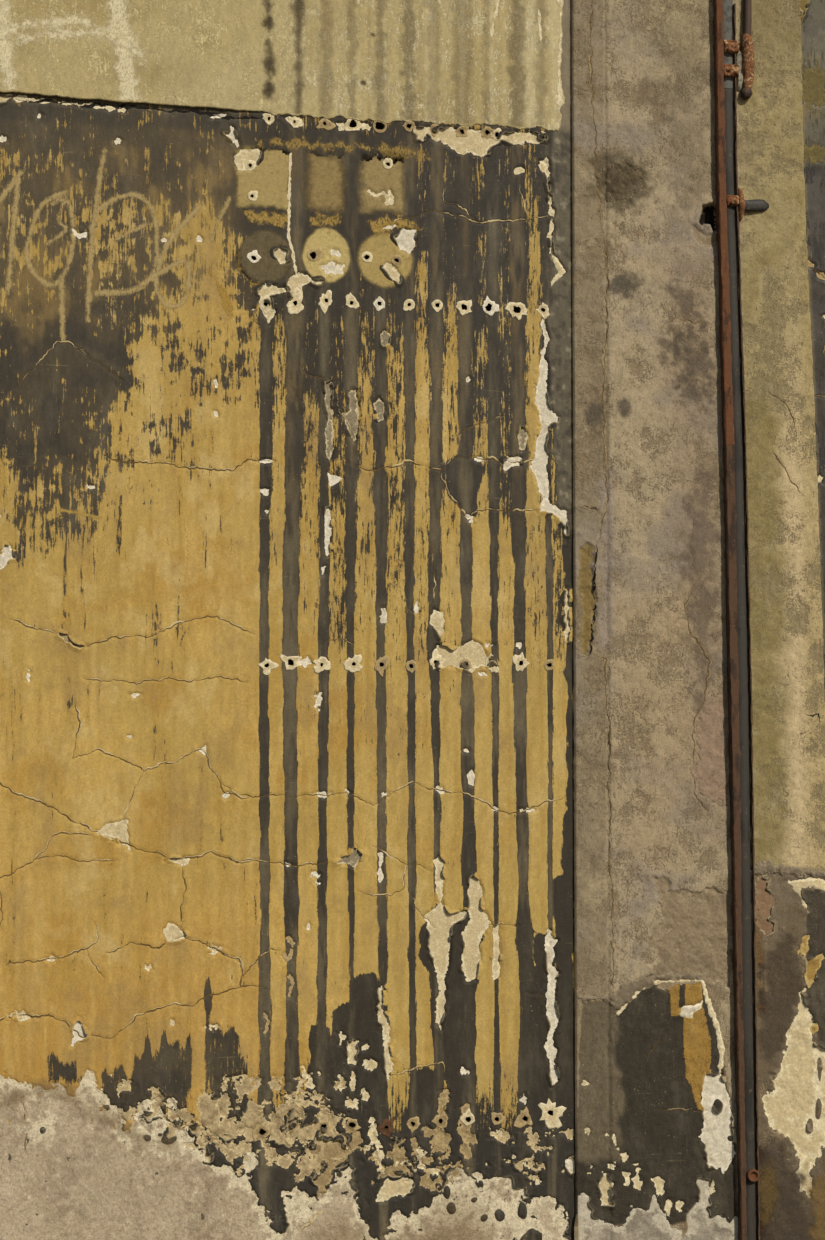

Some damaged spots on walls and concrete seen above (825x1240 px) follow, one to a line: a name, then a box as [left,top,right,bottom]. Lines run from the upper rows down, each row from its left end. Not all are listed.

damp [263,10,273,95]
damp [293,0,303,113]
corrosion [741,34,755,89]
flaking render [406,123,566,286]
crack [12,615,251,647]
crack [91,676,242,685]
crack [0,705,566,1038]
peeling [110,983,590,1202]
damp [0,1070,738,1240]
peeling [561,1133,684,1216]
spalling [616,878,737,1195]
flaking render [762,935,825,1198]